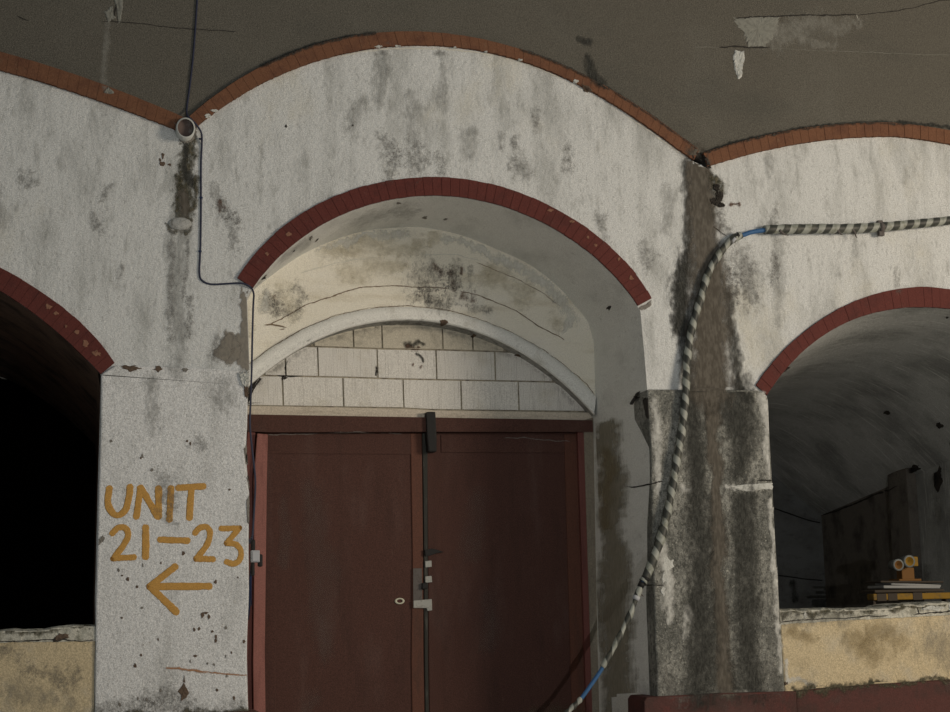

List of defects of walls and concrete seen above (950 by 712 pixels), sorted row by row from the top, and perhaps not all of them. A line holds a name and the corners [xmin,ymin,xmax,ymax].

spalling [104,0,123,24]
crack [103,4,235,32]
crack [735,0,945,19]
water stain [260,32,376,67]
peeling [733,16,779,79]
crack [712,44,817,52]
water stain [165,138,200,252]
crack [249,285,594,394]
water stain [522,38,950,712]